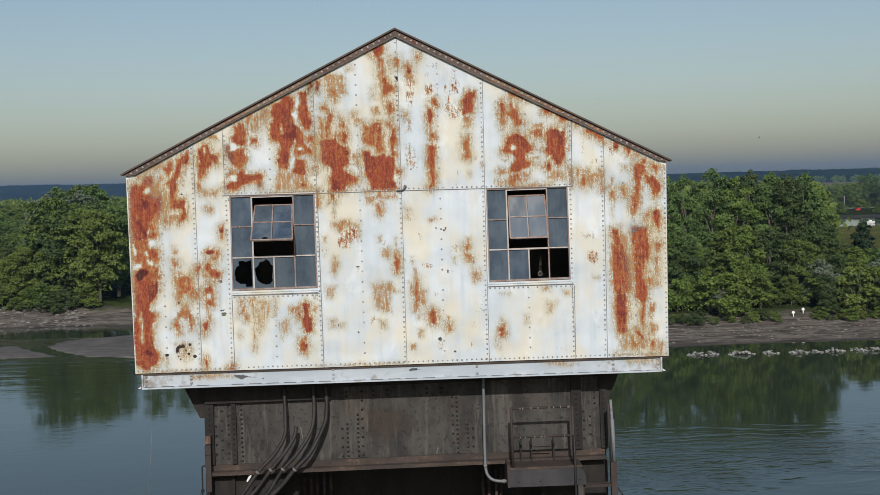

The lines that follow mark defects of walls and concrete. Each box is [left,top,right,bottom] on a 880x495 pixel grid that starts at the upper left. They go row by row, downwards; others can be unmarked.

rust [126,43,482,374]
rust [489,78,667,356]